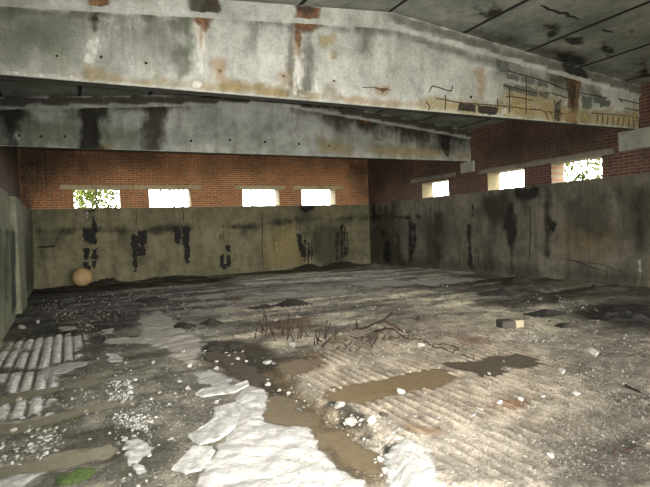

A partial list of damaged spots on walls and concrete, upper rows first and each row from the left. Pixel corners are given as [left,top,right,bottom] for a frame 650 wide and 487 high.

leakage [192,20,207,74]
rust [190,0,221,30]
rust [294,5,320,60]
crack [539,5,579,20]
leakage [565,37,583,45]
leakage [0,81,250,150]
spalling [429,62,640,129]
rust [565,77,581,124]
leakage [483,186,539,222]
leakage [544,190,556,258]